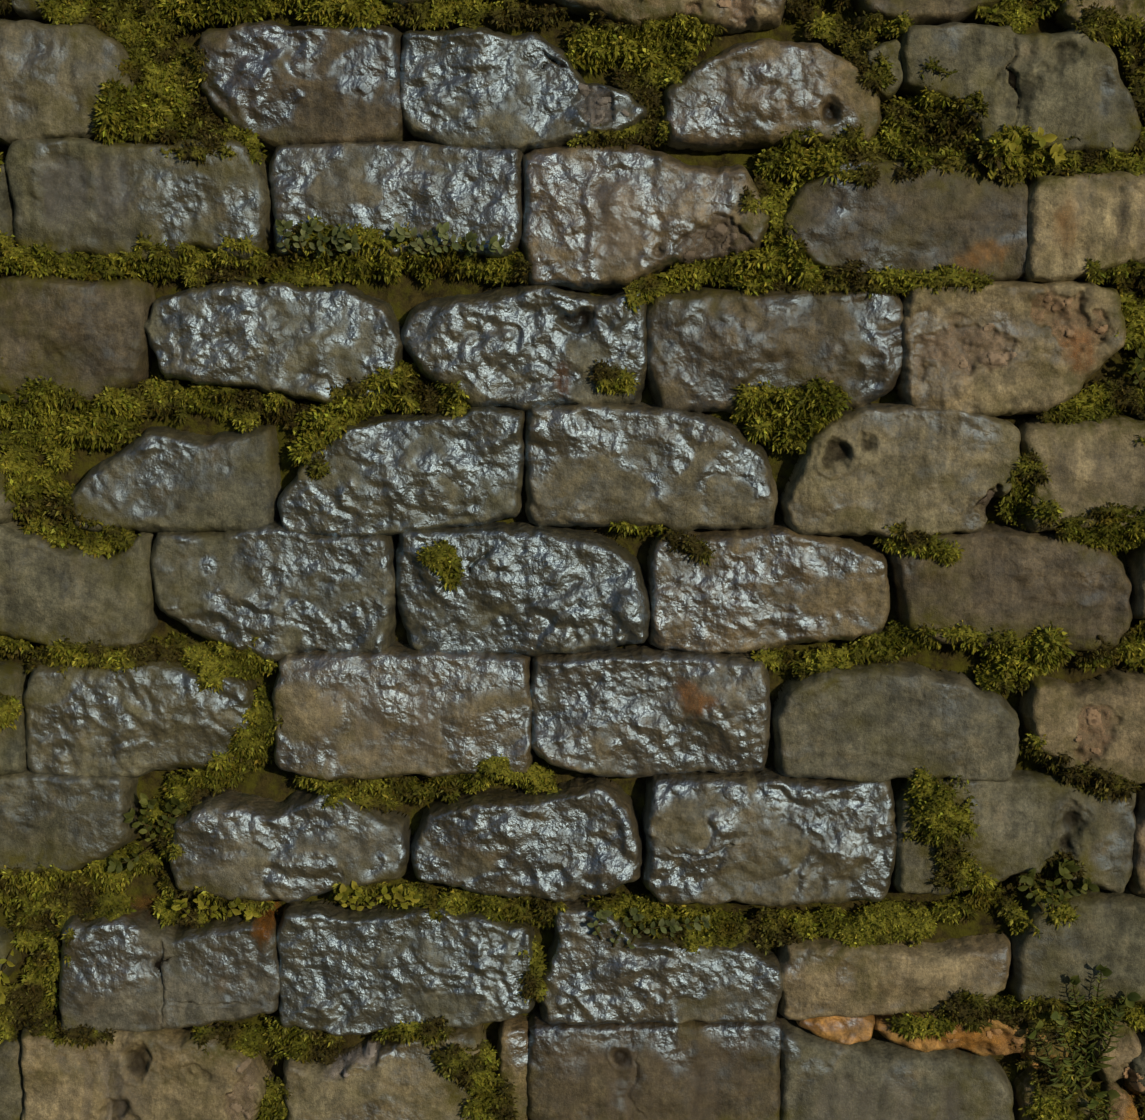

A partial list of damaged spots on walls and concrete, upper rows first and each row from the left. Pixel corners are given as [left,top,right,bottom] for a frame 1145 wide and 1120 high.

crack [1005,63,1017,91]